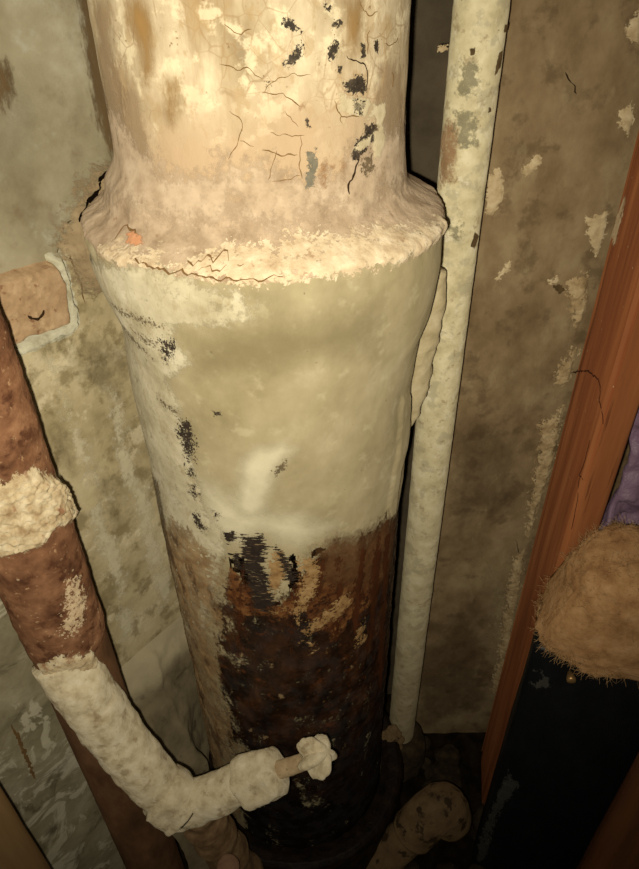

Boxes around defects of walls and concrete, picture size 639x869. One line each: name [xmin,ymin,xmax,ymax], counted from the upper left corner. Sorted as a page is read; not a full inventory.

peeling [281,17,305,68]
crack [221,64,309,181]
peeling [305,148,318,189]
peeling [327,39,386,194]
crack [57,172,106,302]
spalling [553,271,589,331]
spalling [553,346,581,387]
peeling [89,208,464,646]
corrosion [160,508,399,849]